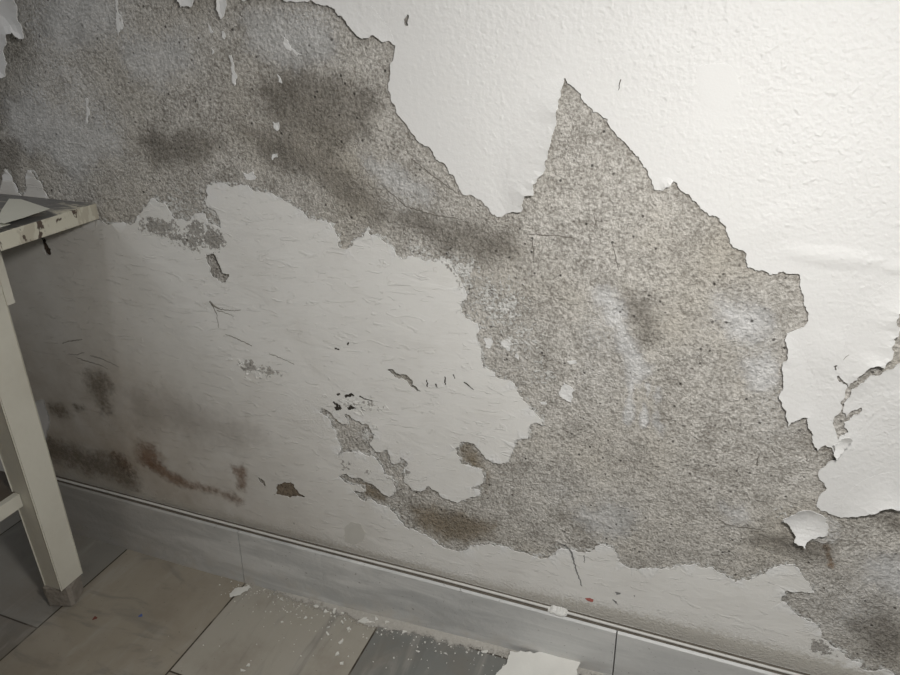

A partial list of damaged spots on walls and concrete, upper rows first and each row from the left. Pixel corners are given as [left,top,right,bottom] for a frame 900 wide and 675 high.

peeling [0,0,24,78]
peeling [312,0,395,45]
leakage [5,99,117,175]
peeling [139,217,226,251]
peeling [837,275,900,411]
flaking render [333,396,384,411]
flaking render [388,369,421,392]
peeling [779,334,848,452]
peeling [258,477,305,497]
peeling [783,510,829,549]
peeling [808,515,842,544]
peeling [809,639,833,655]